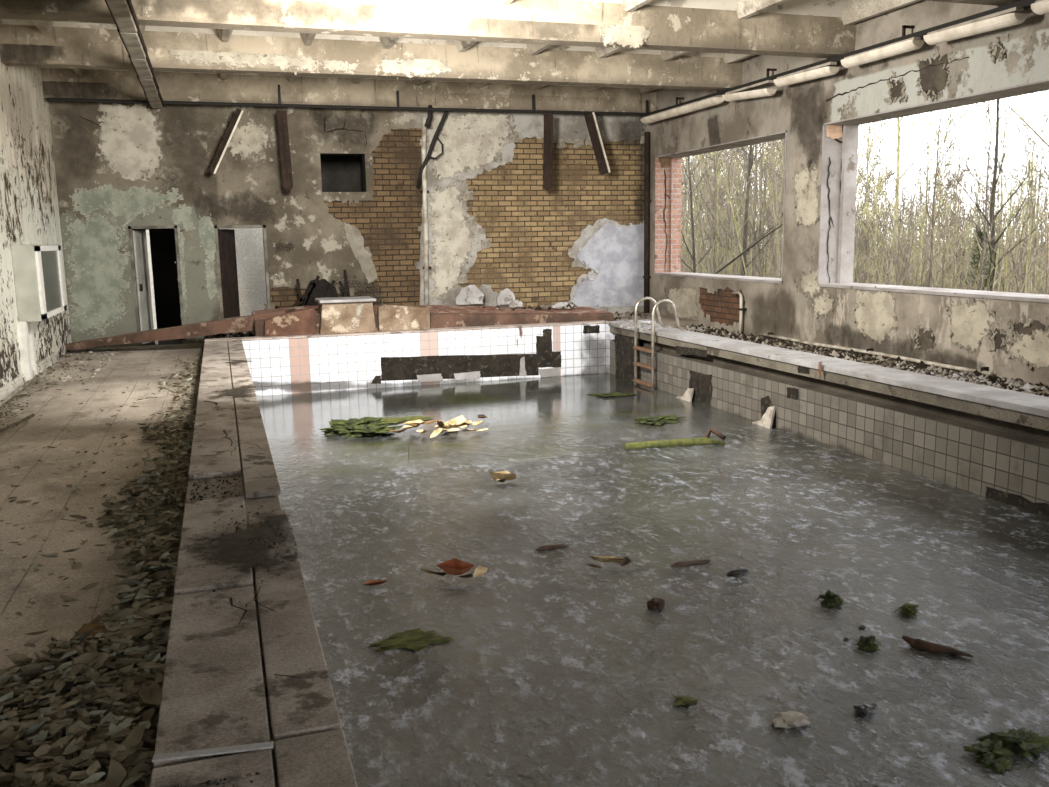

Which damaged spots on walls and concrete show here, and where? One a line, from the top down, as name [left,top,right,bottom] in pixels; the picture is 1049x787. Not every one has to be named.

peeling [598,24,654,48]
peeling [168,50,358,75]
peeling [378,53,452,79]
leakage [167,117,270,221]
peeling [0,102,217,337]
spalling [314,111,644,308]
spalling [264,287,306,310]
spalling [666,285,747,327]
peeling [372,329,561,384]